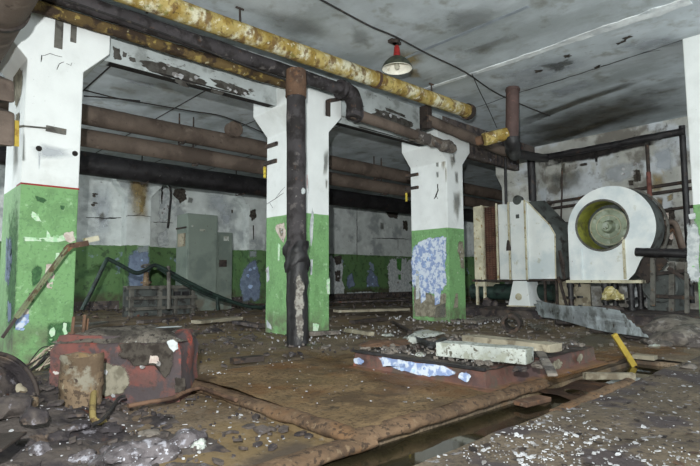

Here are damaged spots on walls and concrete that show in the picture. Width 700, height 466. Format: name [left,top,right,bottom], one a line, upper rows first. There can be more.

peeling [113,46,249,96]
peeling [372,107,413,128]
damp [534,87,622,118]
damp [566,119,615,136]
corrosion [131,181,146,213]
peeling [25,231,76,243]
peeling [8,253,59,330]
peeling [128,250,150,286]
peeling [240,260,270,301]
peeling [326,256,379,294]
peeling [387,236,458,318]
peeling [47,322,71,346]